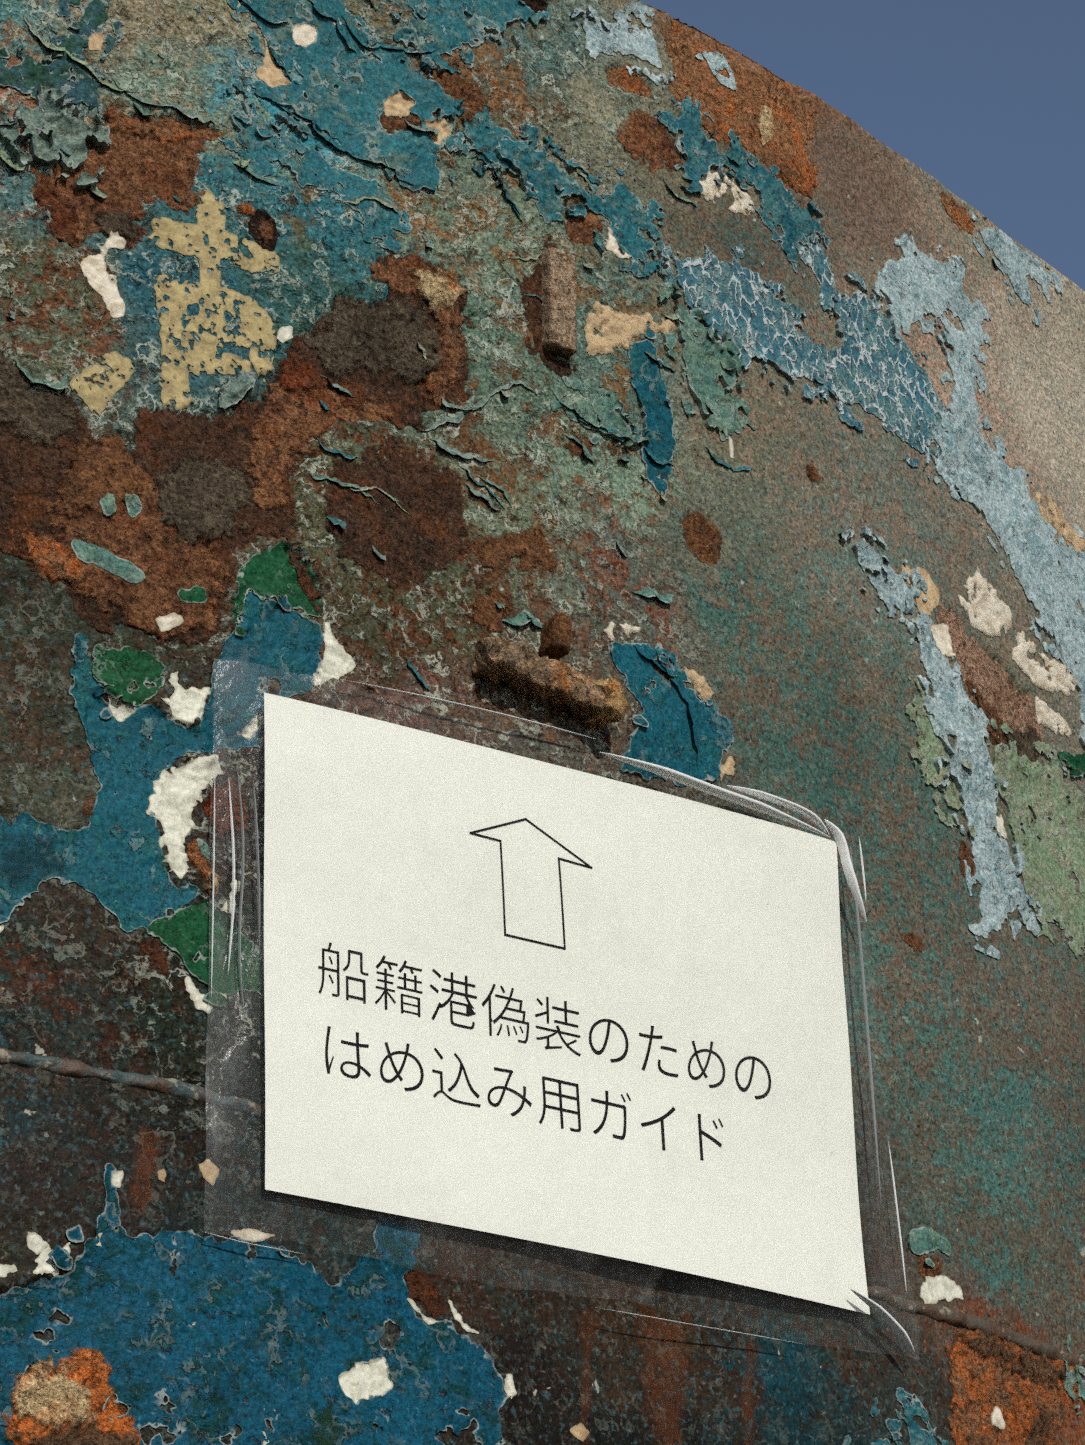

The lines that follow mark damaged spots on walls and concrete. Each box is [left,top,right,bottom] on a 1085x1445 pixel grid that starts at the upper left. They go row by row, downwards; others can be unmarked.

peeling [0,0,124,190]
corrosion [605,17,819,197]
peeling [80,231,126,318]
corrosion [516,203,603,377]
corrosion [0,251,558,647]
peeling [192,0,1085,960]
peeling [0,541,356,1014]
corrosion [582,678,628,730]
corrosion [1,1348,141,1445]
peeling [0,1159,517,1445]
peeling [869,1387,949,1445]
corrosion [945,1328,1079,1445]